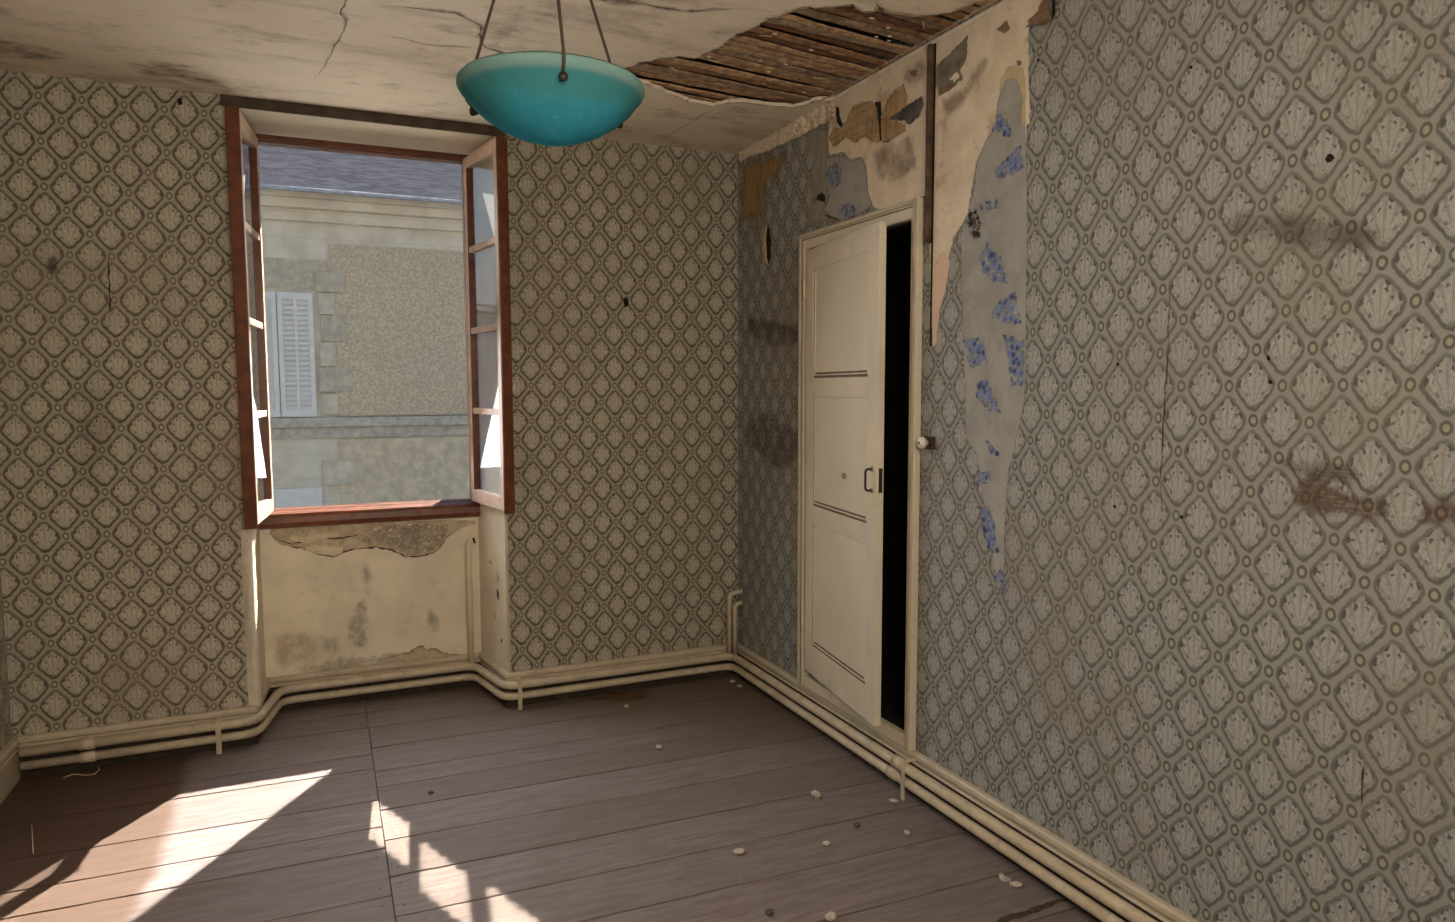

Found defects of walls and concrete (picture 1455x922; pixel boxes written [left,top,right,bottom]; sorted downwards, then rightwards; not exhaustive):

crack [314,0,347,80]
crack [387,5,504,53]
peeling [738,0,1043,347]
spalling [270,520,476,557]